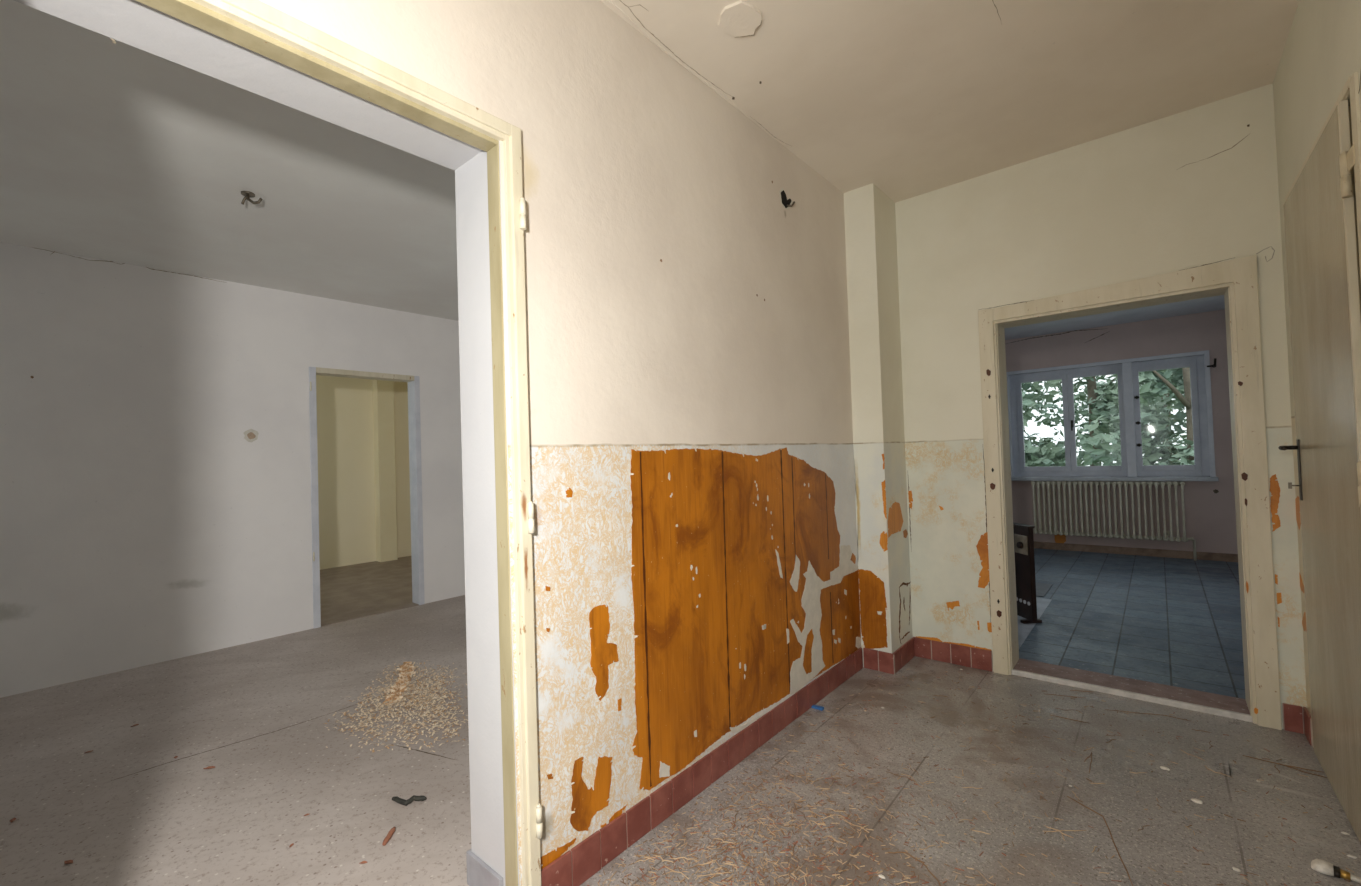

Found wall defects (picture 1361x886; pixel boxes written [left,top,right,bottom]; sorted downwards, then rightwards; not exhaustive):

peeling [880,454,913,552]
peeling [1269,474,1301,532]
peeling [976,532,990,588]
peeling [589,447,890,791]
peeling [541,756,627,869]